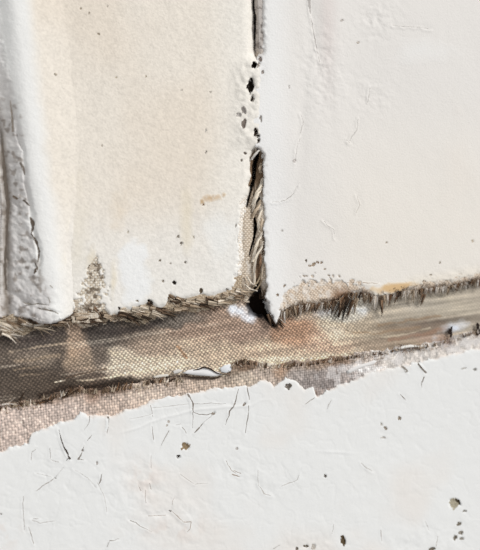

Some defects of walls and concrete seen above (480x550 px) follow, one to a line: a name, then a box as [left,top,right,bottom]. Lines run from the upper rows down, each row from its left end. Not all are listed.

spalling [78,256,108,312]
peeling [153,364,232,379]